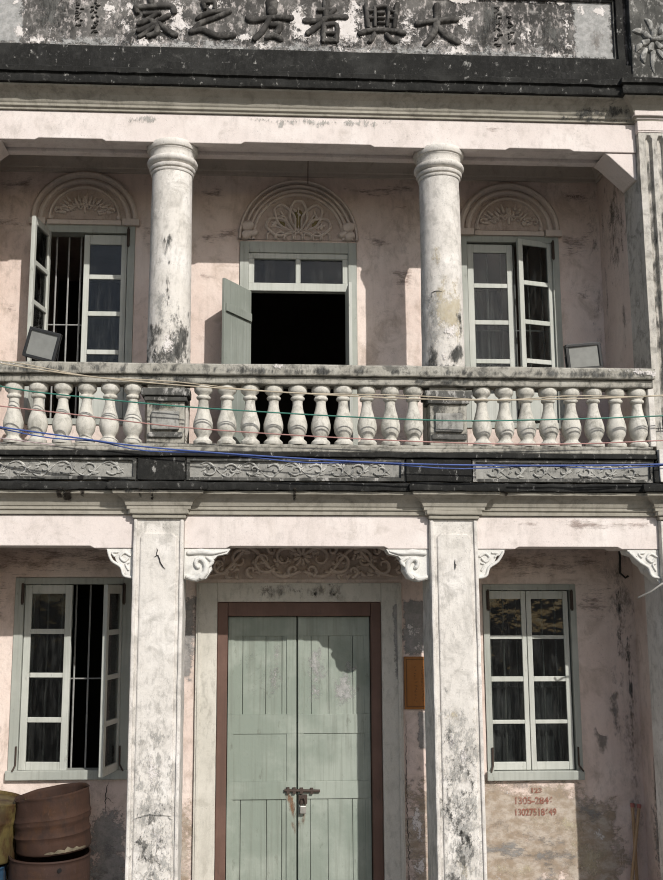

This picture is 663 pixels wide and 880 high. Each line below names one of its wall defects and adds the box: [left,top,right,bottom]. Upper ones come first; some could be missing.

peeling [0,0,614,59]
peeling [425,279,466,367]
damp [571,364,663,395]
flaking render [393,600,424,677]
damp [608,588,634,717]
flaking render [417,711,426,749]
flaking render [405,778,428,880]
flaking render [440,712,631,880]